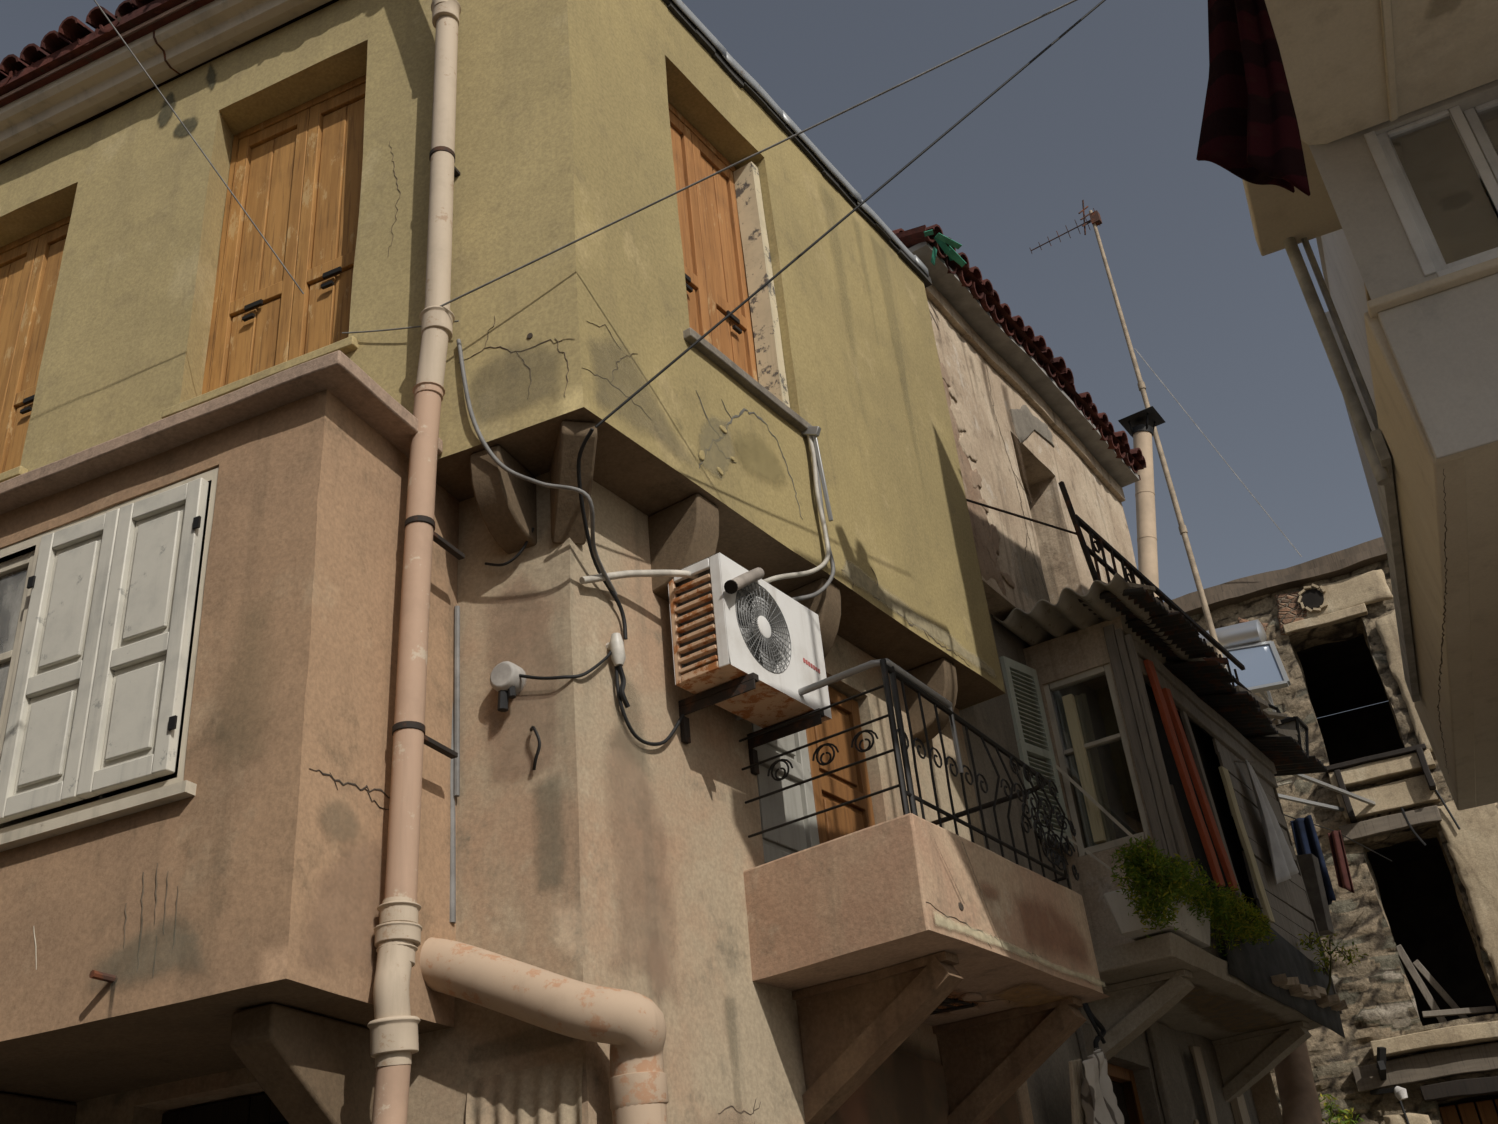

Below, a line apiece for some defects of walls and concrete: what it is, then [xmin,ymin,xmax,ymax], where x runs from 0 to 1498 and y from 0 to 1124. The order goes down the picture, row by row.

crack [459,315,650,418]
spalling [1010,405,1055,447]
crack [696,391,802,518]
peeling [939,361,1015,589]
crack [309,768,390,810]
spalling [928,992,983,1017]
crack [718,1100,761,1124]